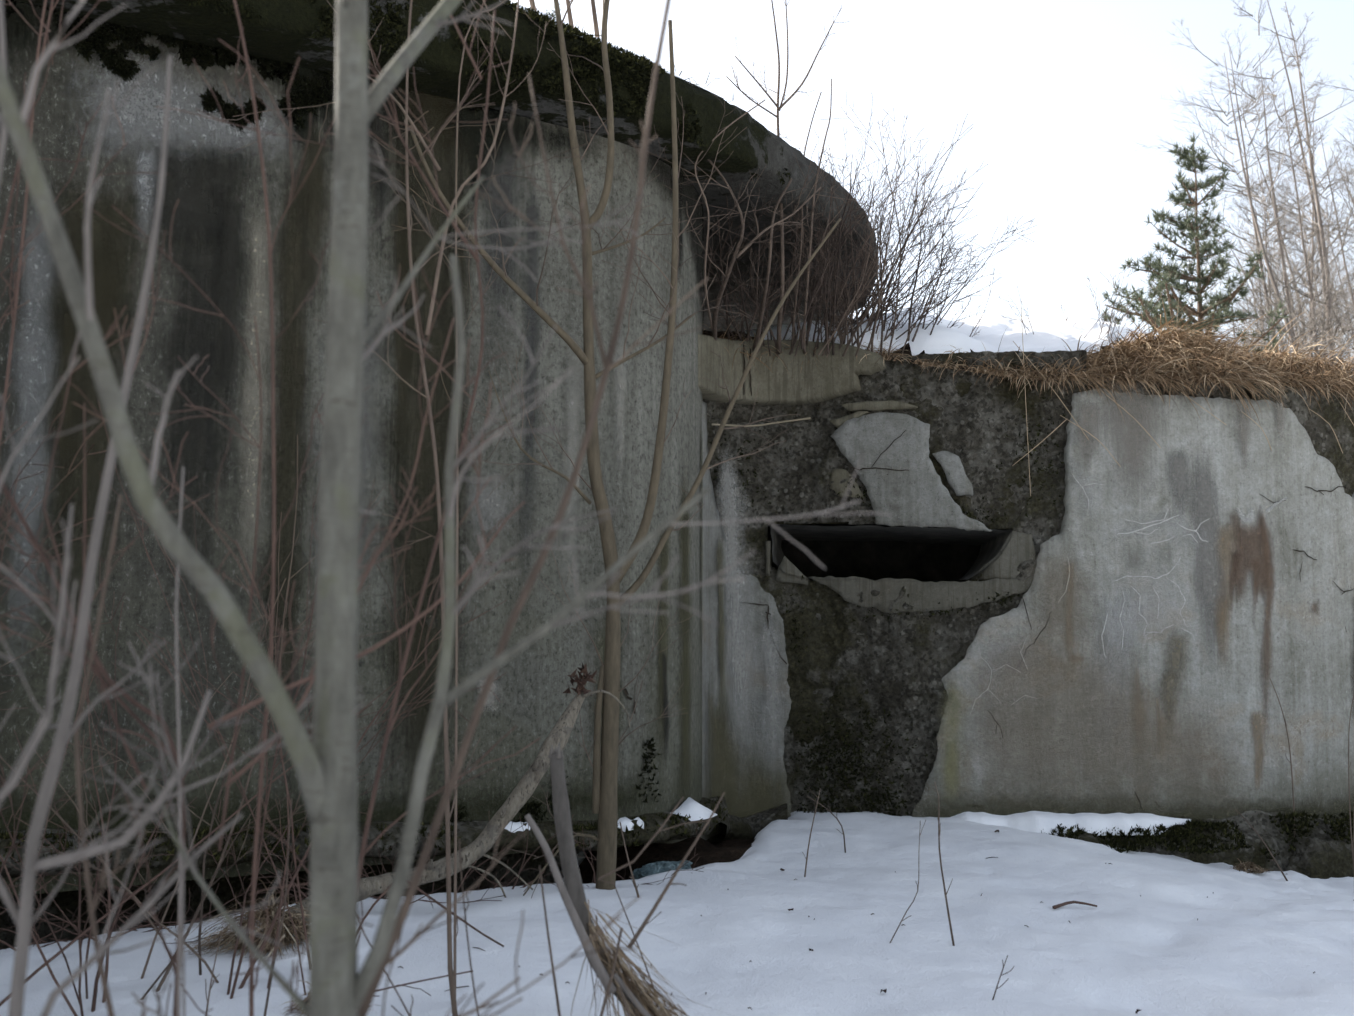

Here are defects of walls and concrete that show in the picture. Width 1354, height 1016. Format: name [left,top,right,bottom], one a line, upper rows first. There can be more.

damp [3,0,116,47]
damp [15,234,111,587]
damp [66,58,335,685]
damp [369,87,593,761]
damp [659,464,783,829]
spalling [698,334,1087,816]
crack [1014,597,1052,672]
corrosion [1230,514,1274,779]
crack [1260,486,1346,503]
crack [1293,549,1353,594]
damp [924,797,1354,823]
spalling [1064,807,1354,879]